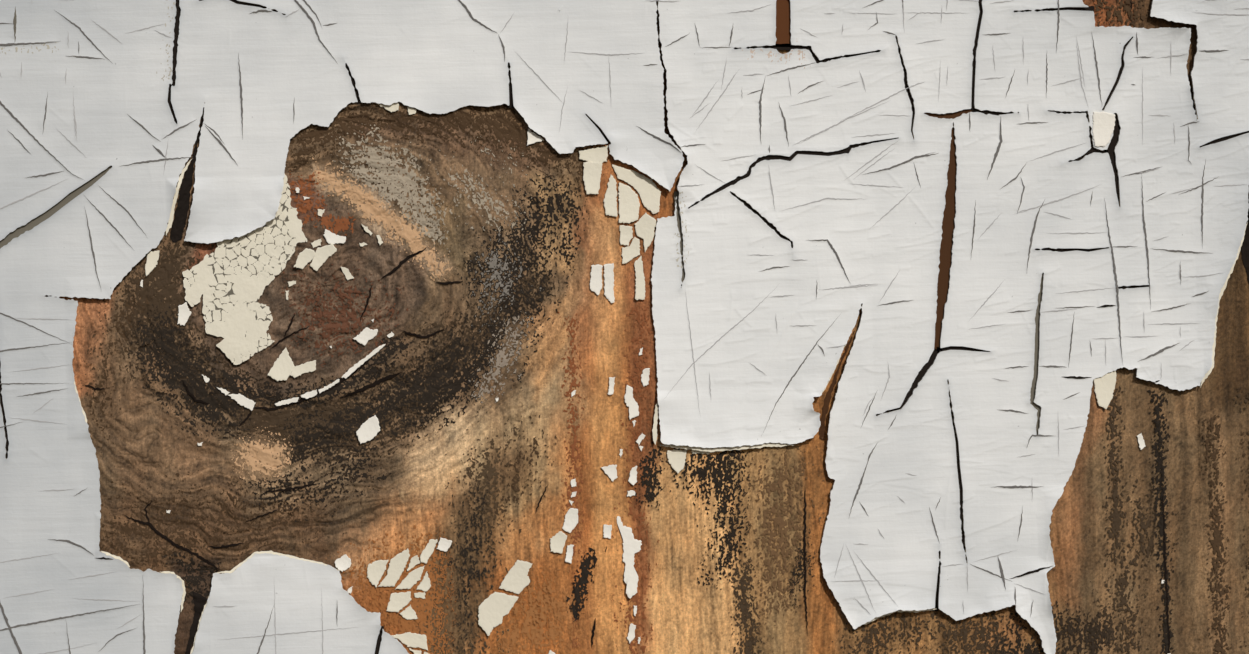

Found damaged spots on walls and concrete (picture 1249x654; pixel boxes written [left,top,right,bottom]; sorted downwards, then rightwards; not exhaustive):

crack [458,0,514,108]
peeling [1082,0,1197,90]
crack [0,0,361,287]
peeling [1092,111,1116,147]
crack [0,313,105,458]
crack [185,183,309,361]
peeling [45,102,1045,654]
crack [637,0,1249,636]
peeling [1047,224,1249,654]
crack [0,576,146,654]
crack [185,591,208,654]
crack [375,626,384,654]